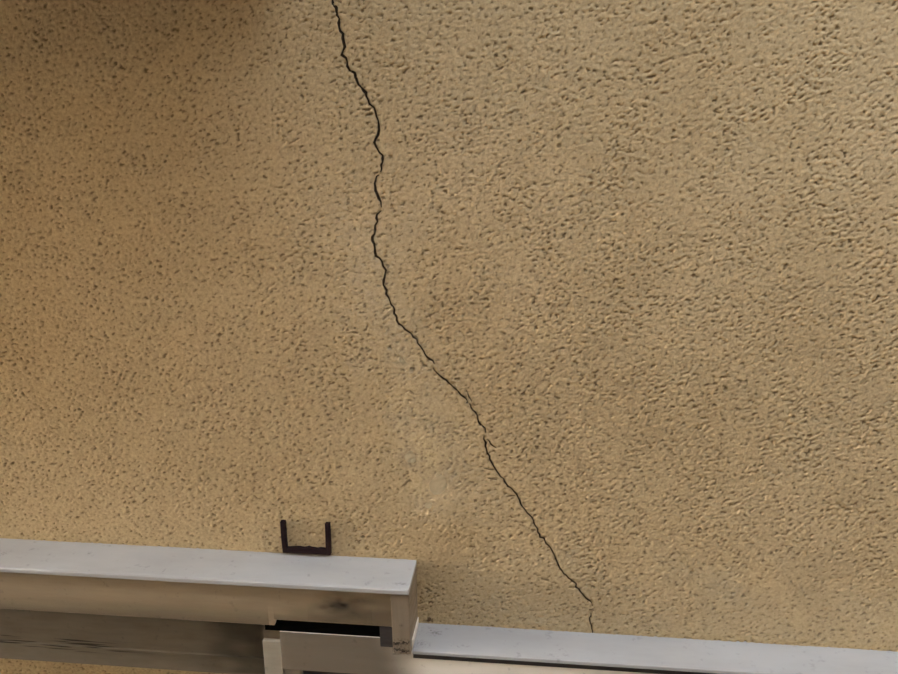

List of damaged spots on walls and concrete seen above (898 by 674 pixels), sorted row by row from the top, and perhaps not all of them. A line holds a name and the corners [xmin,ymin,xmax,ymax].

crack [332,0,593,633]